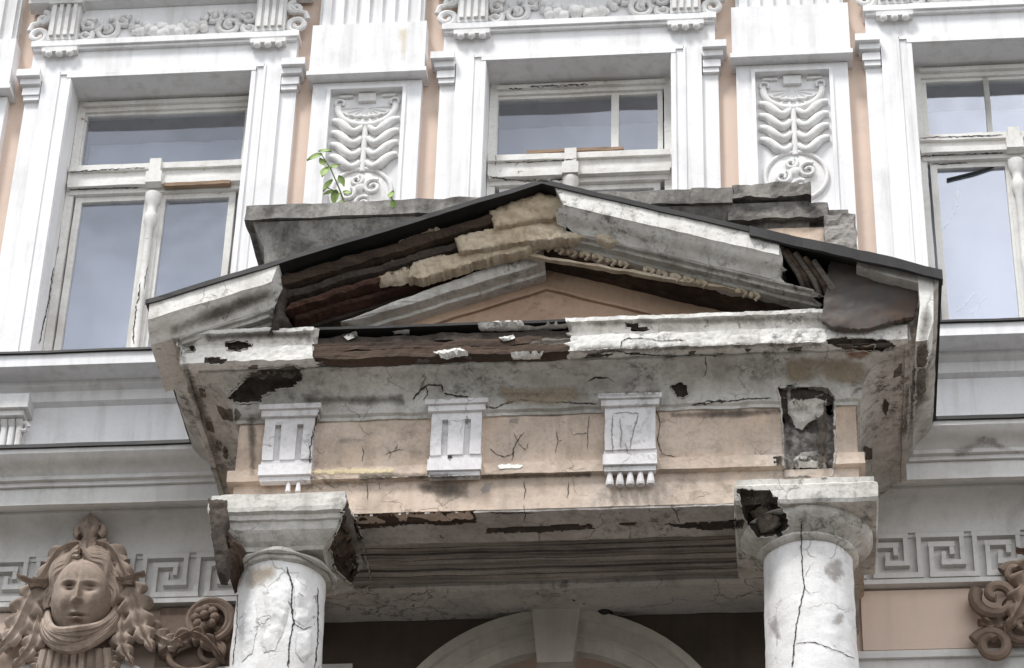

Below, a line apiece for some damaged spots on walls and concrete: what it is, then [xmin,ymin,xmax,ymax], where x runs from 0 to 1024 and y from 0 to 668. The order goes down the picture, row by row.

spalling [378,193,619,288]
spalling [205,340,253,365]
spalling [205,363,303,459]
crack [491,434,528,458]
crack [413,337,769,452]
spalling [774,385,837,479]
spalling [208,498,272,594]
crack [287,568,319,668]
spalling [329,499,593,595]
crack [490,483,534,522]
spalling [664,487,791,539]
crack [791,522,855,666]